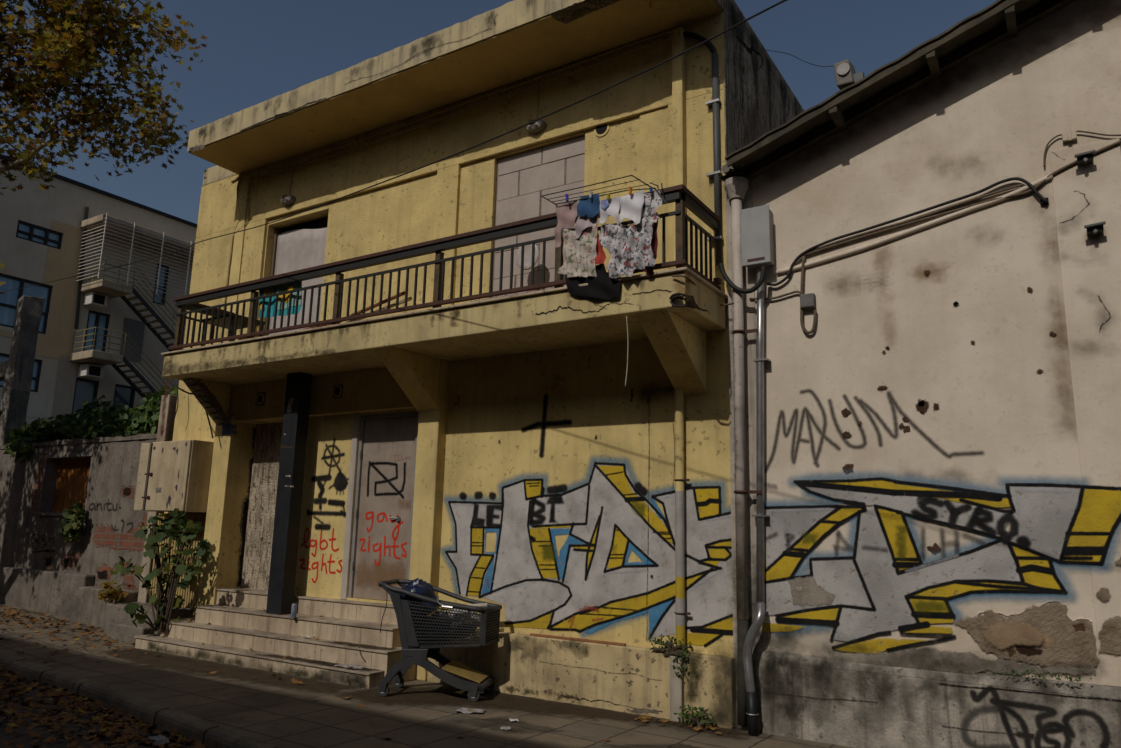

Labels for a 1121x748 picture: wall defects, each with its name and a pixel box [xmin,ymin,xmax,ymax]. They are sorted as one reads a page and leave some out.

spalling [551,0,621,24]
crack [536,289,672,315]
flaking render [839,600,1121,675]